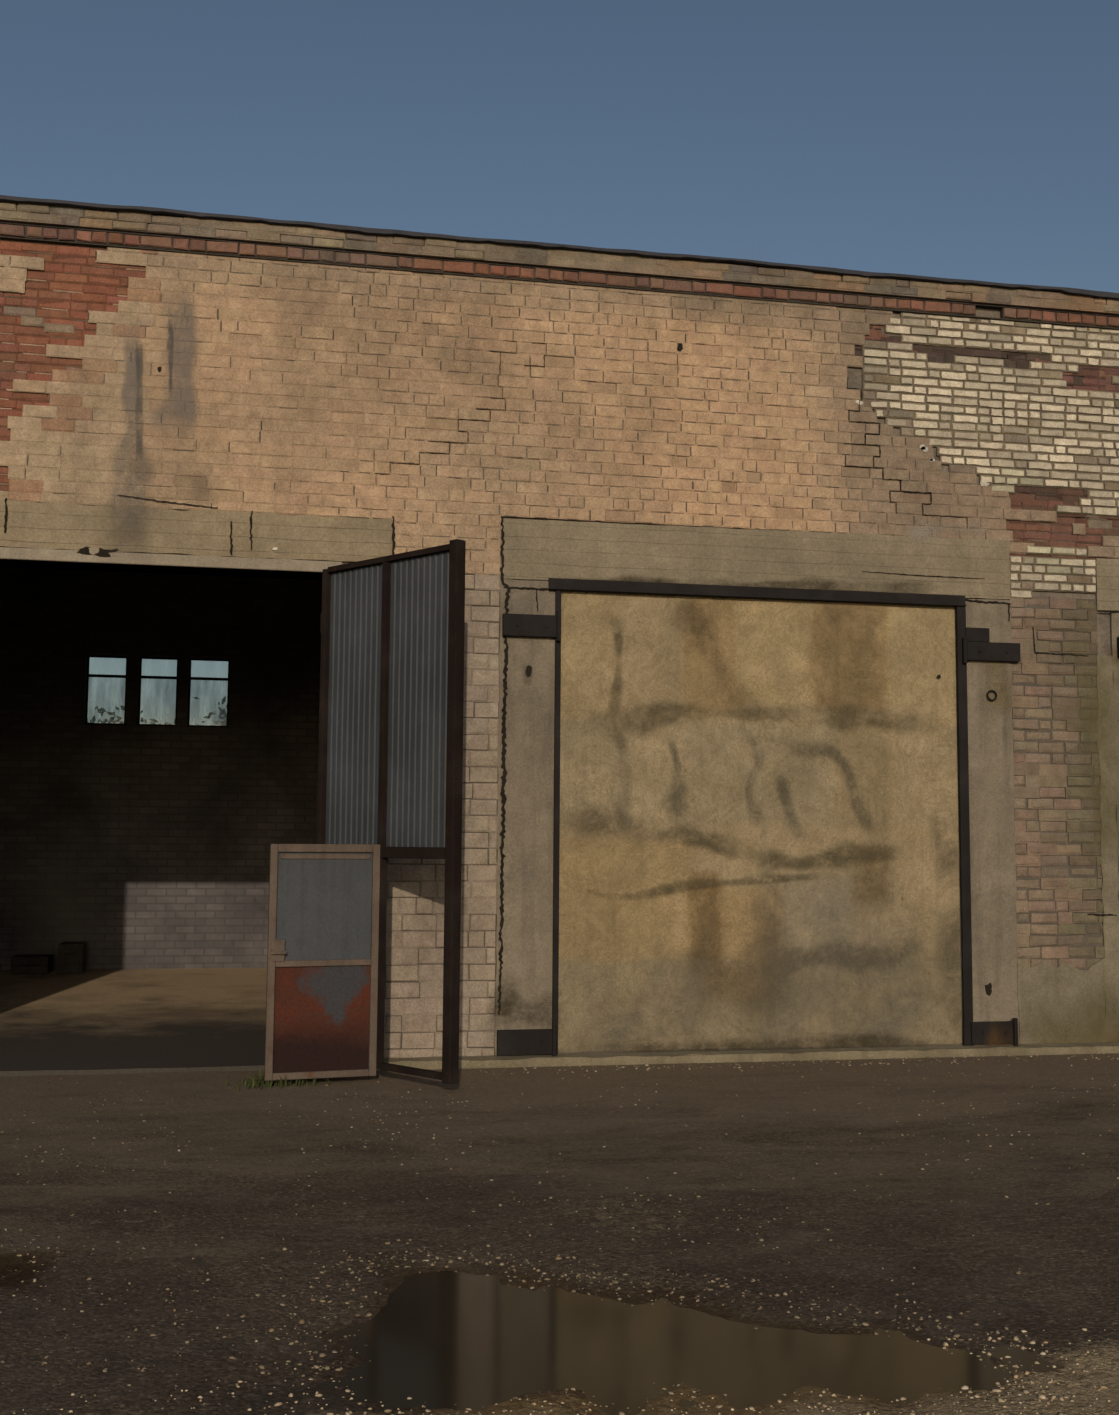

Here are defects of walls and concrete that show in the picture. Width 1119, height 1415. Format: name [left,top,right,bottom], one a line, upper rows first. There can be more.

spalling [0,240,146,441]
spalling [0,466,9,491]
crack [844,380,968,528]
peeling [855,313,1119,597]